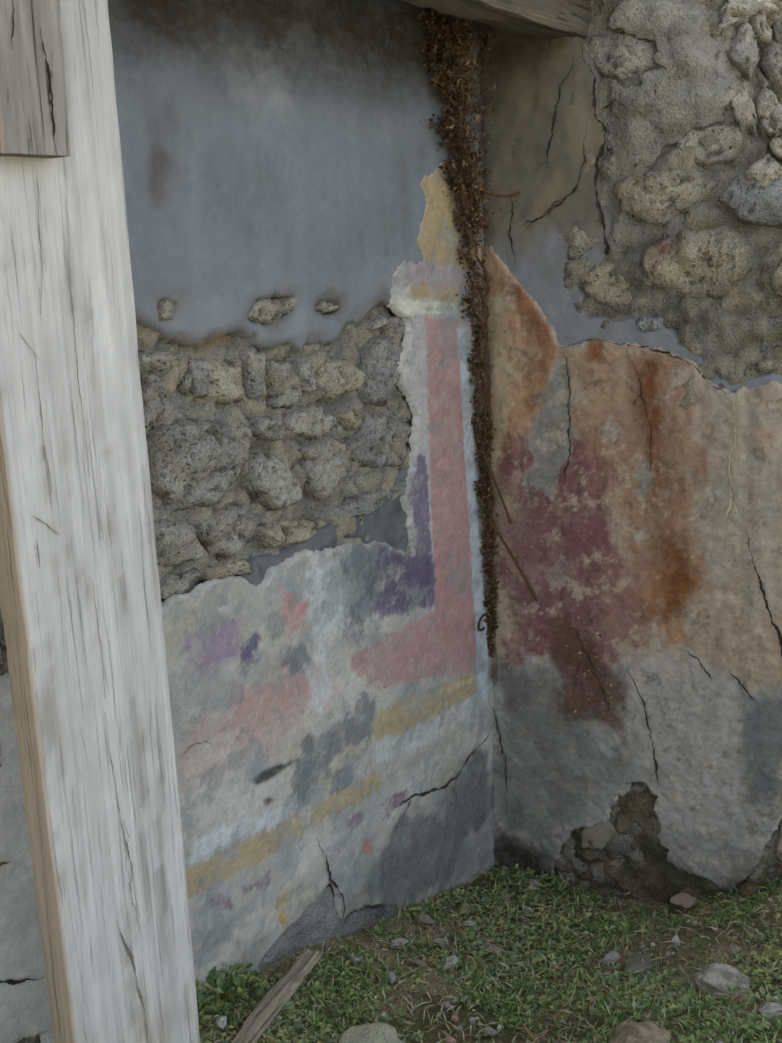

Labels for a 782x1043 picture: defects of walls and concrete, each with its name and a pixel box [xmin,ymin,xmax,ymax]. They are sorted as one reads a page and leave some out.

crack [508,34,628,262]
crack [562,339,782,657]
crack [628,669,659,786]
crack [687,651,758,704]
crack [317,839,397,921]
spalling [555,781,735,904]
crack [0,977,43,985]